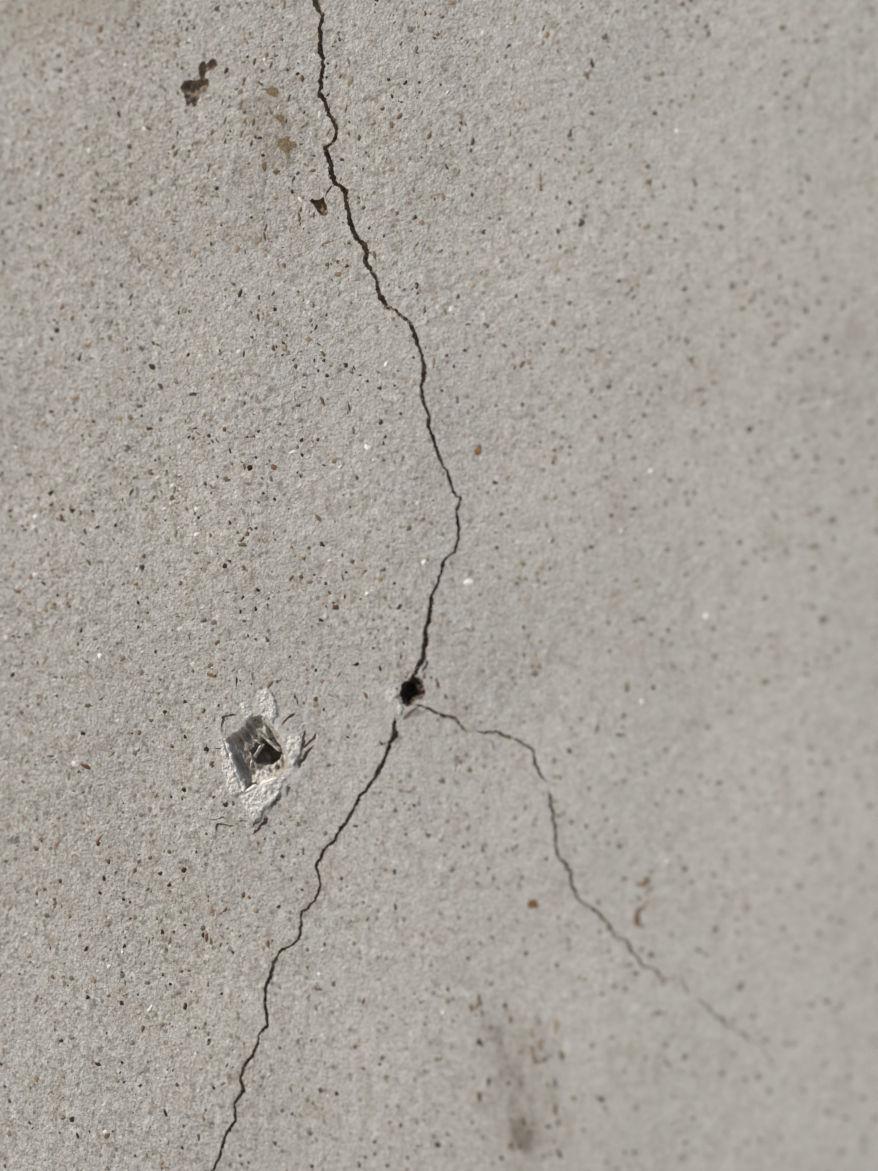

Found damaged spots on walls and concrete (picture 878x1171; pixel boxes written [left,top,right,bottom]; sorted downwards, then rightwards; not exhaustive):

crack [312,0,462,676]
spalling [209,688,316,835]
crack [211,704,777,1171]